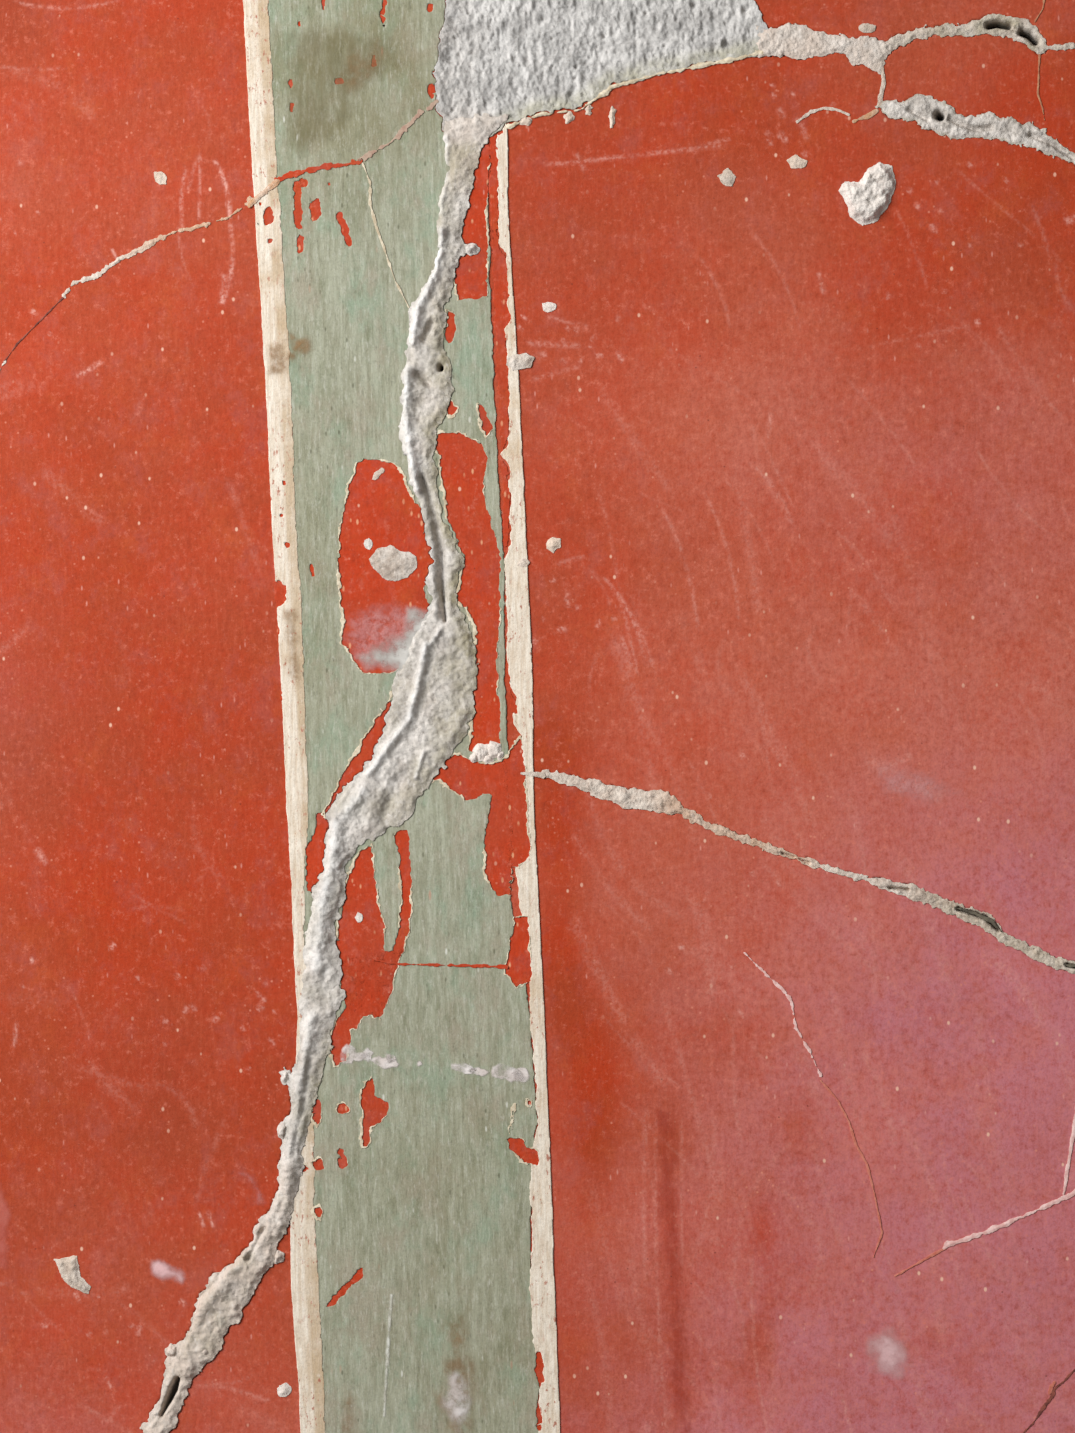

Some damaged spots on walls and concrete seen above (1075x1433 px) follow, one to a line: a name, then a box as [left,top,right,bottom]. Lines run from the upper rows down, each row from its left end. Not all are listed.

crack [755,0,1075,164]
spalling [427,0,770,896]
peeling [336,458,434,675]
crack [0,99,509,1433]
peeling [305,691,393,892]
peeling [329,830,413,1067]
peeling [503,916,532,989]
crack [521,769,1075,974]
peeling [303,1076,389,1172]
crack [744,952,883,1258]
spalling [54,1255,91,1294]
crack [1023,1369,1075,1433]